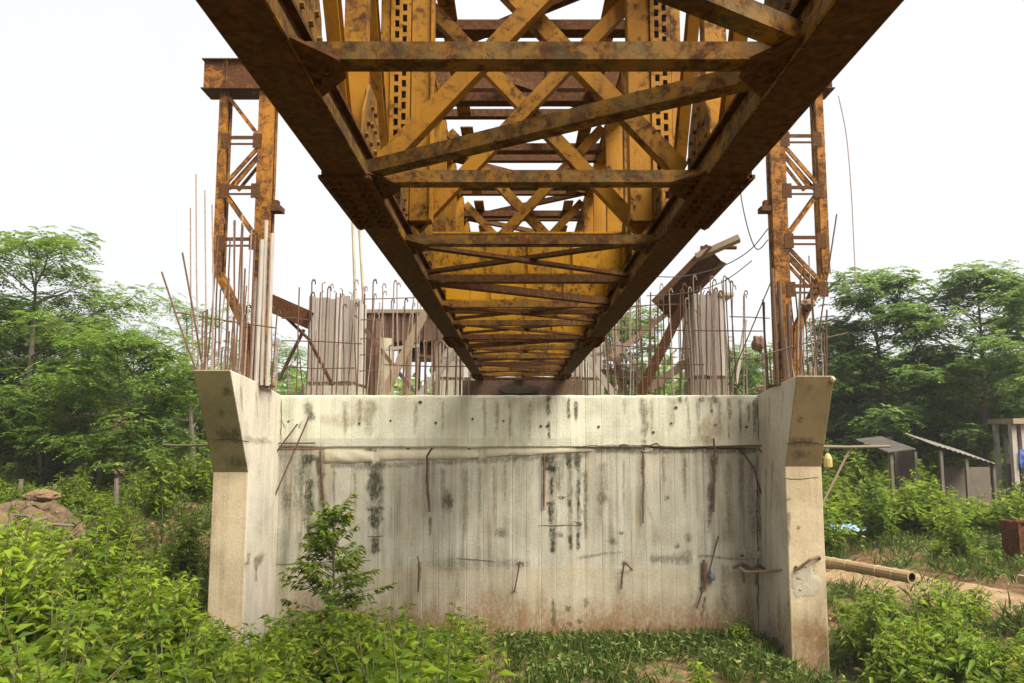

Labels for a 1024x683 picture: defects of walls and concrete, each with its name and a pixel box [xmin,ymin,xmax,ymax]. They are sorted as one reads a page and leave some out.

damp [339,448,418,551]
damp [436,441,755,557]
rust [696,536,719,616]